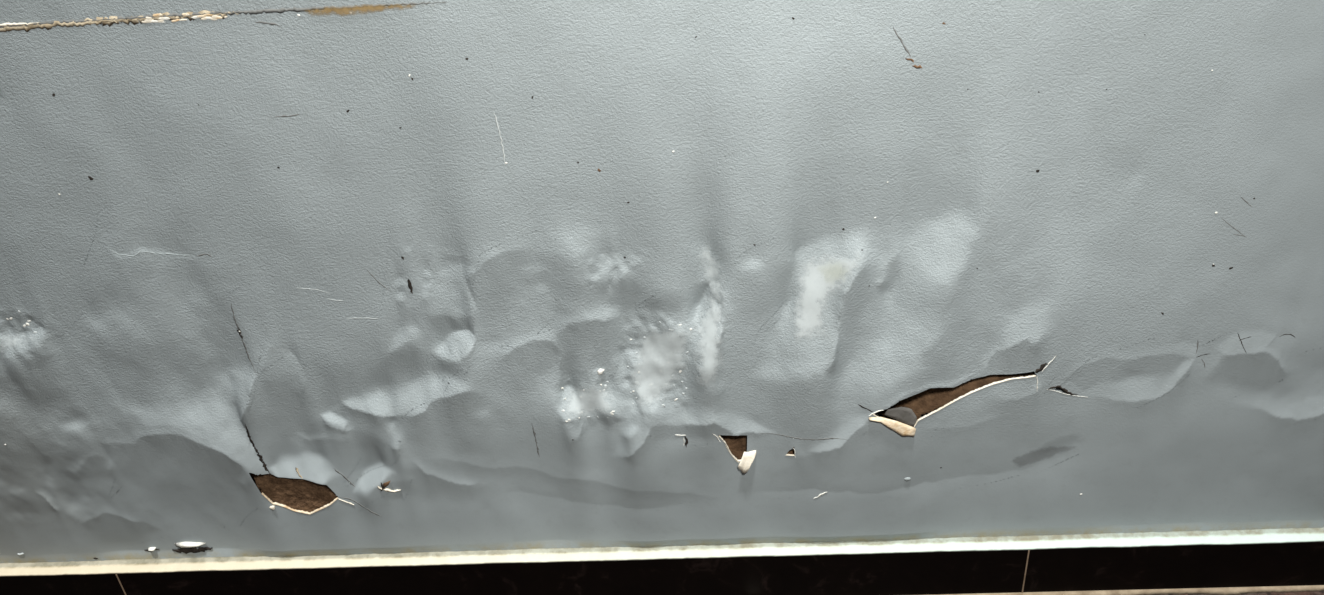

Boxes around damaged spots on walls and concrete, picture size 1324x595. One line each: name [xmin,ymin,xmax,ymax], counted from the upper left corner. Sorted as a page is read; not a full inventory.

peeling [78,10,240,27]
water stain [796,259,854,337]
water stain [633,251,720,402]
flaking render [878,372,1036,422]
flaking render [718,435,747,460]
flaking render [251,473,338,512]